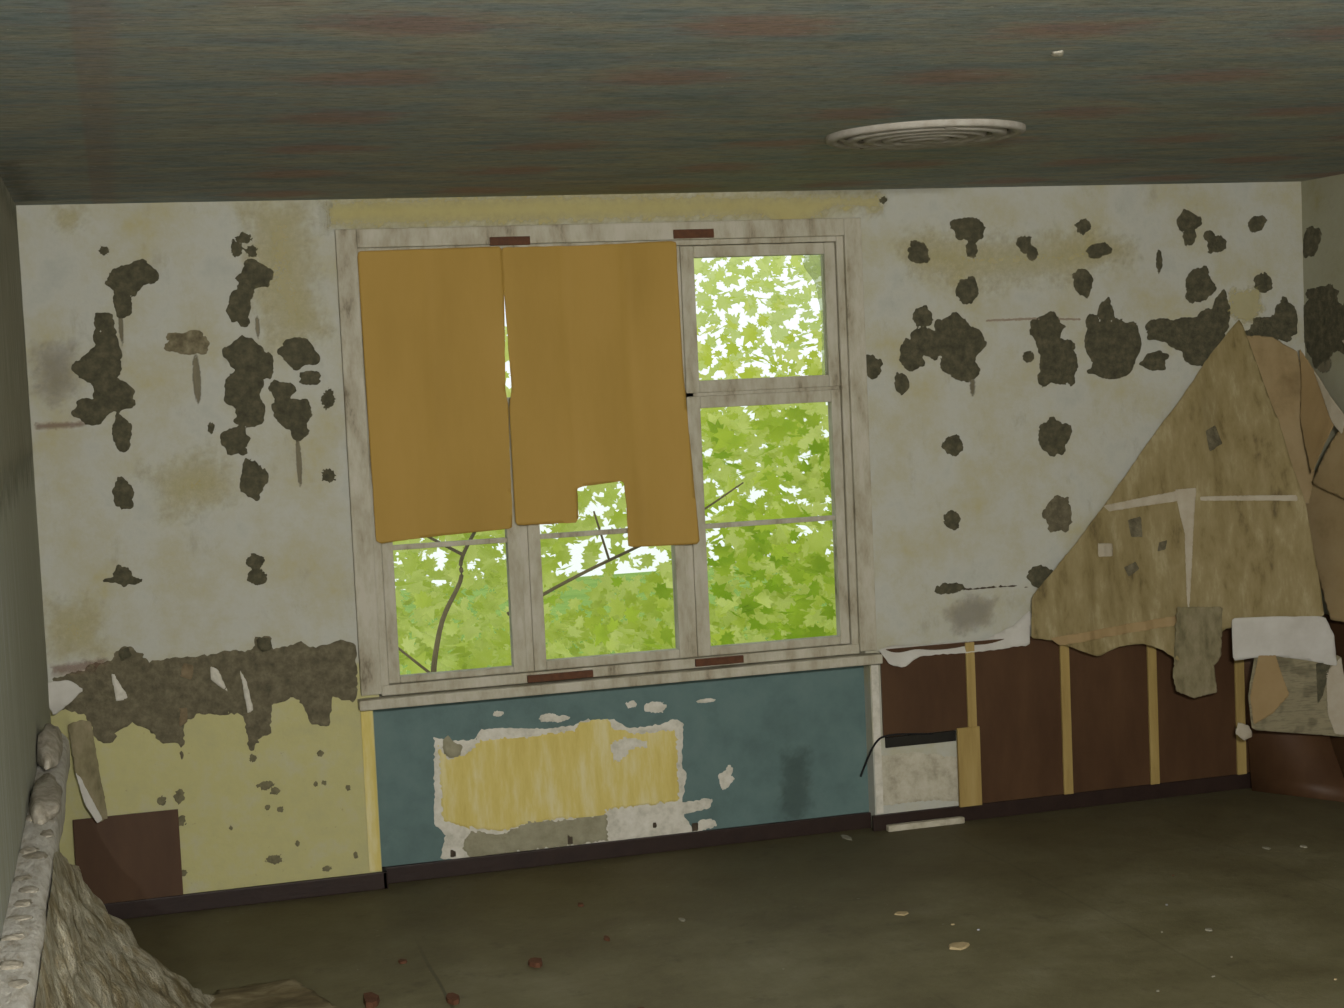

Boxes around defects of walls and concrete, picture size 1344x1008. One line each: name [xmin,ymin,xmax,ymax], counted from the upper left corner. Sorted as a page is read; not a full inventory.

spalling [71,259,159,453]
spalling [164,232,336,501]
spalling [1022,209,1231,387]
spalling [1245,272,1344,373]
spalling [1038,417,1072,457]
spalling [112,476,134,510]
spalling [1042,495,1072,533]
spalling [103,564,142,587]
spalling [246,553,267,585]
spalling [1027,565,1053,588]
spalling [52,636,358,762]
peeling [433,700,735,859]